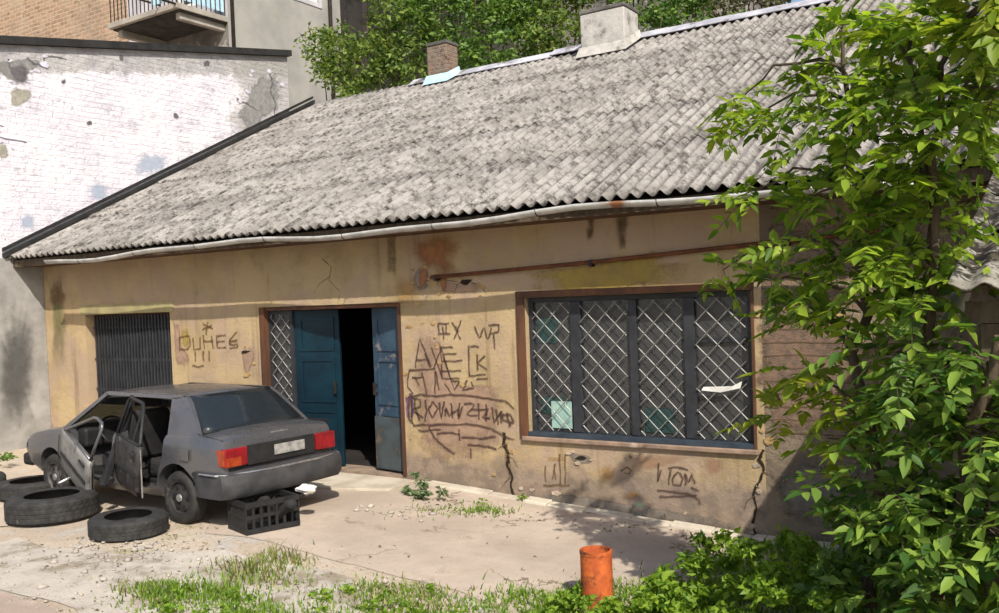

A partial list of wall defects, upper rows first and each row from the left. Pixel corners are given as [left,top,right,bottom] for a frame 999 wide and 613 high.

spalling [0,54,65,106]
peeling [232,69,285,133]
rust [417,239,453,290]
water stain [4,335,29,405]
crack [498,432,517,495]
crack [744,449,779,535]